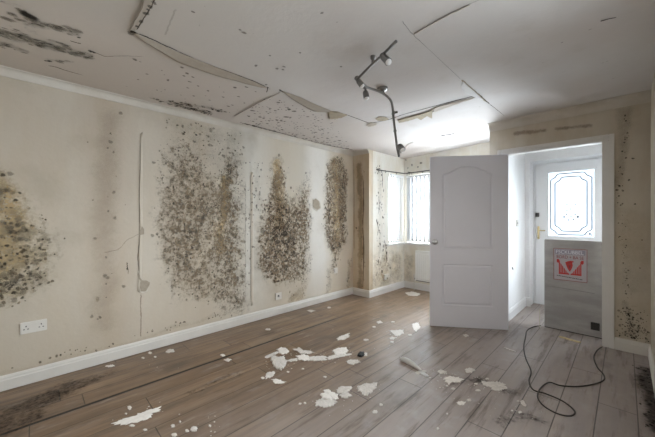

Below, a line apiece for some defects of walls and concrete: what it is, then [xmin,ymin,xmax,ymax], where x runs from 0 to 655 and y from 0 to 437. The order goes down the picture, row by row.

water stain [0,30,93,59]
water stain [241,99,354,151]
water stain [0,192,54,307]
water stain [156,149,311,319]
water stain [323,157,348,268]